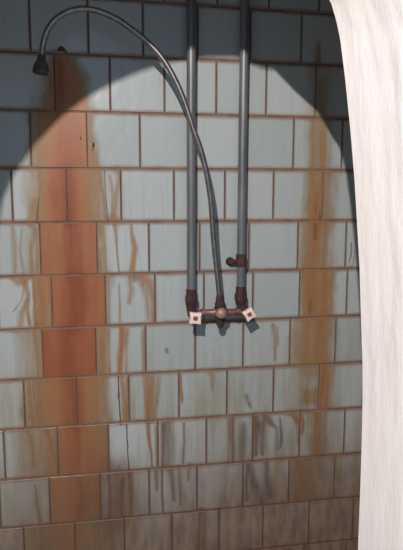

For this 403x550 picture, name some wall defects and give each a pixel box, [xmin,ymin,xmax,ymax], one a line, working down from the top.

rust [13,57,132,550]
rust [129,225,155,323]
rust [142,329,169,511]
rust [296,133,332,456]